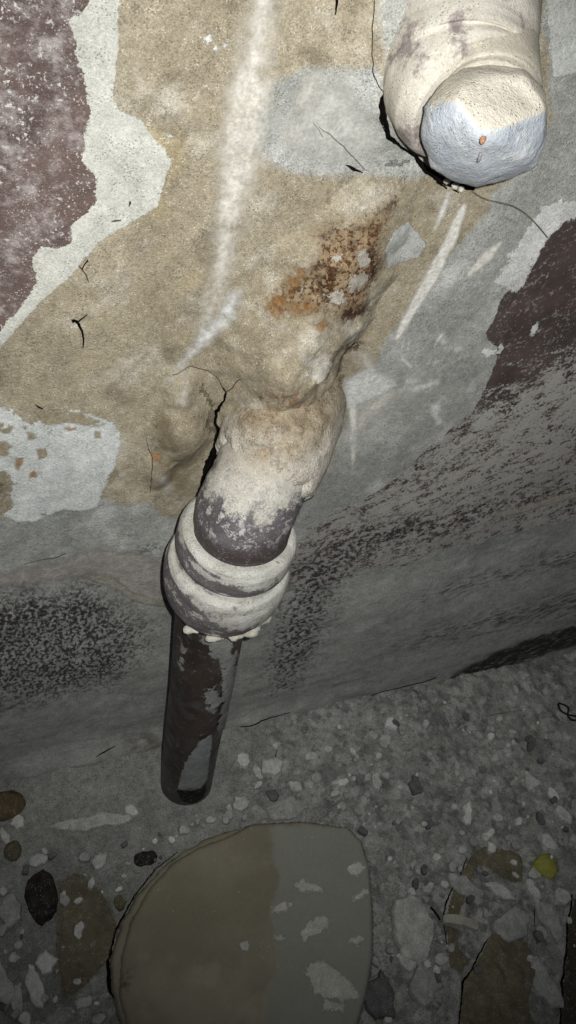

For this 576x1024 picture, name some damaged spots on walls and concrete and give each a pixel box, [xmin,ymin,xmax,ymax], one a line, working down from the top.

flaking render [0,0,381,523]
damp [179,0,271,364]
rust [270,197,386,319]
flaking render [322,0,561,482]
peeling [495,199,576,292]
crack [69,314,87,348]
crack [172,366,241,491]
rust [301,343,359,385]
damp [344,360,439,472]
damp [0,597,135,697]
damp [269,488,576,689]
crack [559,894,573,1024]